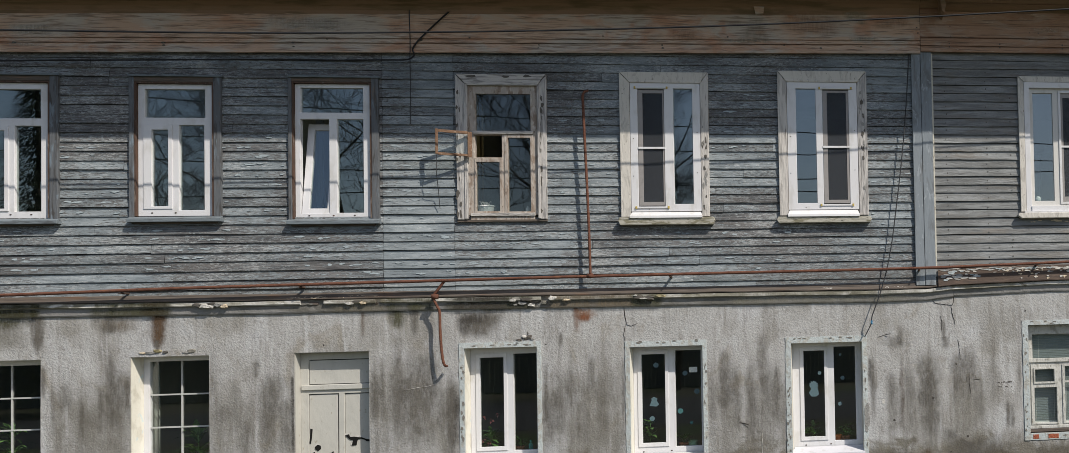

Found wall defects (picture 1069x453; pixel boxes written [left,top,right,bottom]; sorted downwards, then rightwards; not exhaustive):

peeling [940,266,1069,281]
water stain [448,388,459,443]